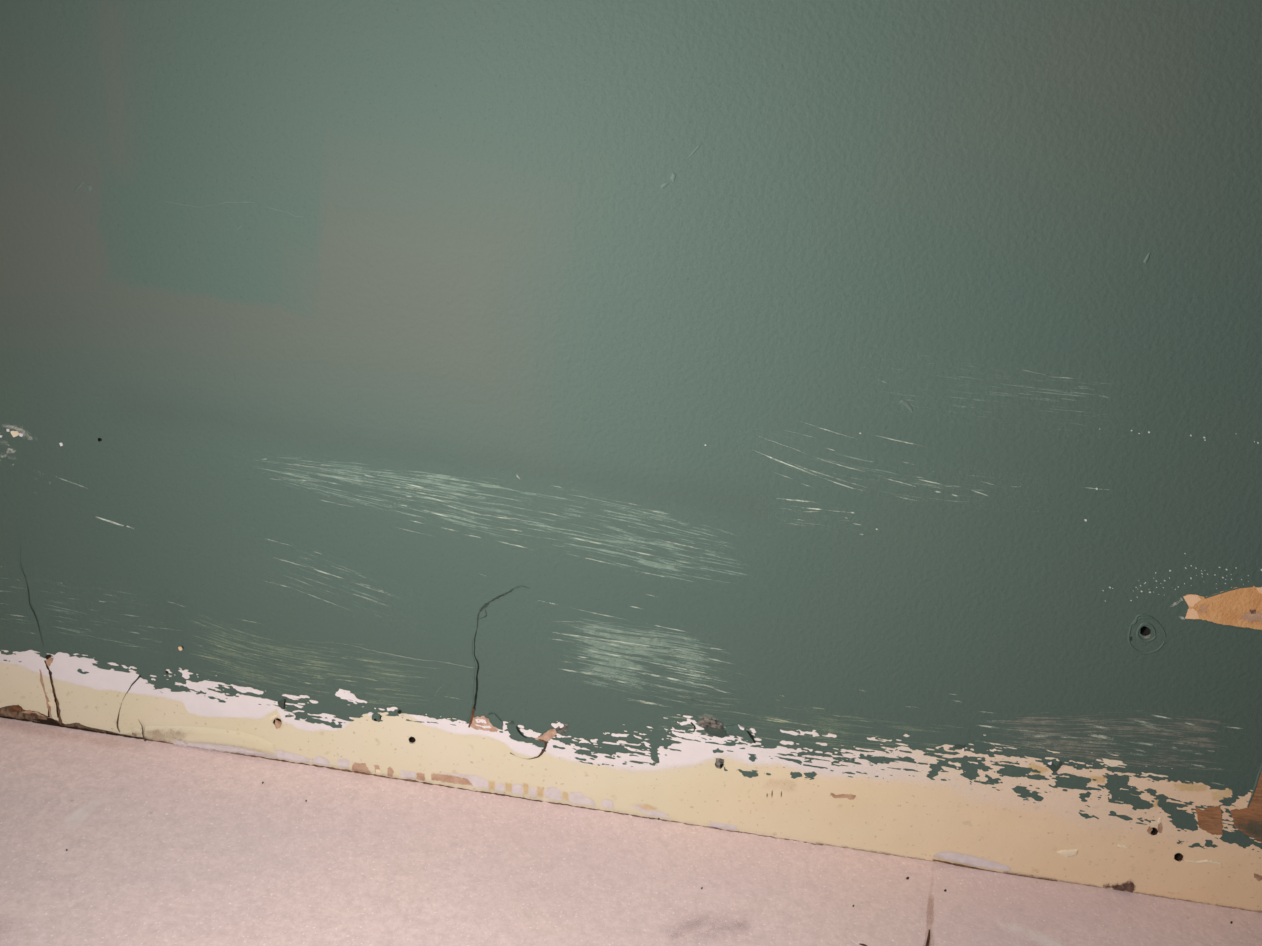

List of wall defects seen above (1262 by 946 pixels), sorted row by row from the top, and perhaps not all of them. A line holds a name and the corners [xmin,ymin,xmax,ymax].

crack [18,529,62,725]
crack [467,584,528,728]
peeling [1172,585,1262,632]
peeling [0,650,1262,912]